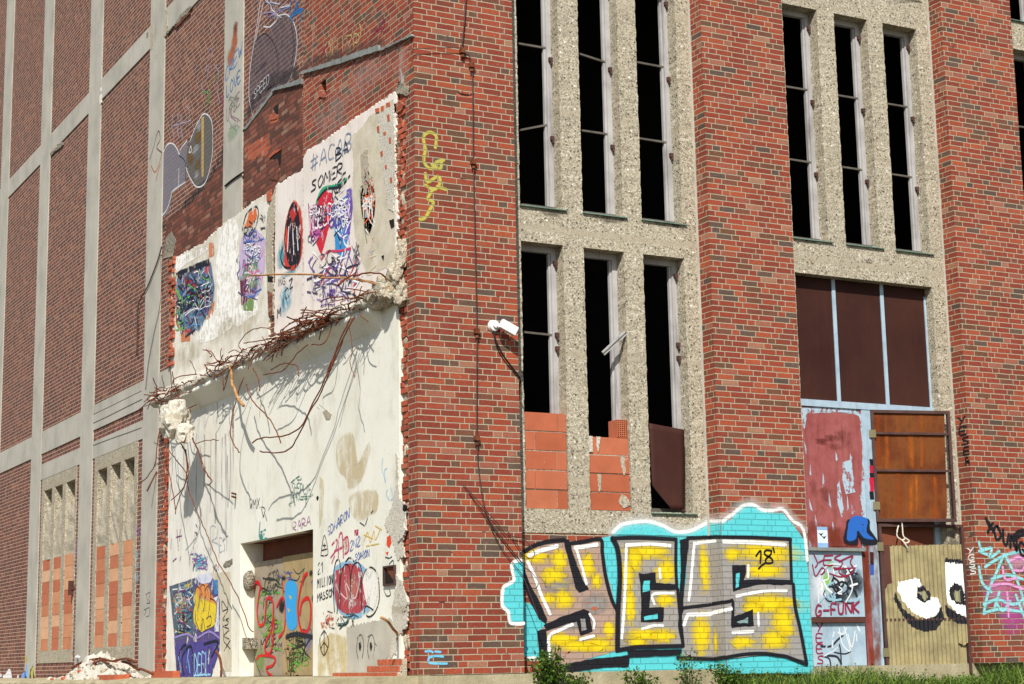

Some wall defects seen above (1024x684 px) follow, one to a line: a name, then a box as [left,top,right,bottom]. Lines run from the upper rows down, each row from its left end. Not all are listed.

peeling [141,79,411,675]
leakage [336,437,378,518]
peeling [801,407,866,528]